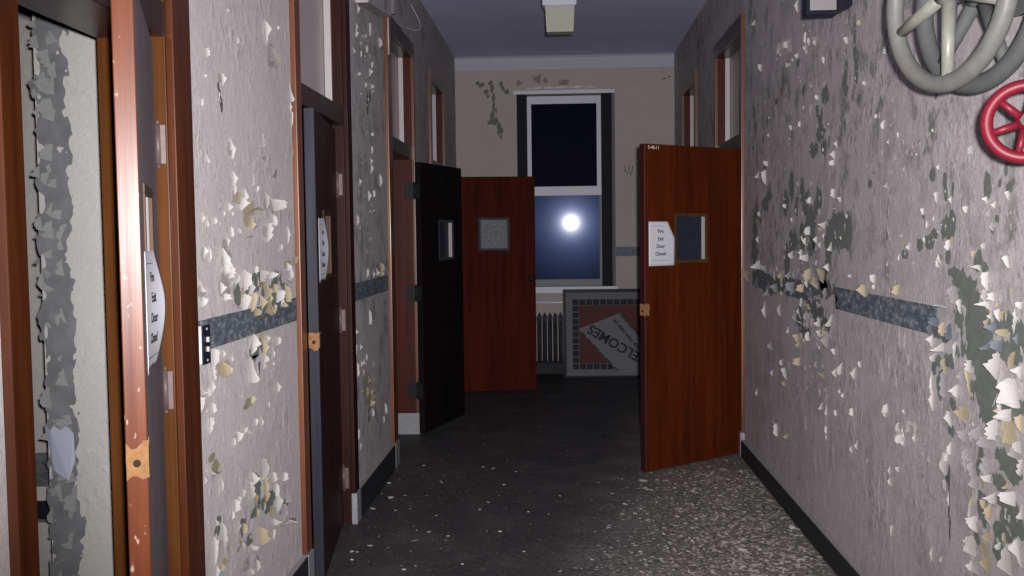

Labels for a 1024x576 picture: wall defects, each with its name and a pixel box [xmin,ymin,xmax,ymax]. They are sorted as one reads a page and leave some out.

peeling [226,0,281,69]
peeling [351,3,382,114]
peeling [476,81,509,140]
peeling [27,13,86,576]
peeling [200,333,282,492]
peeling [198,133,299,316]
peeling [357,130,382,253]
peeling [356,329,387,421]
peeling [367,261,385,277]
peeling [740,161,860,440]
peeling [848,95,1024,576]
peeling [214,458,298,576]